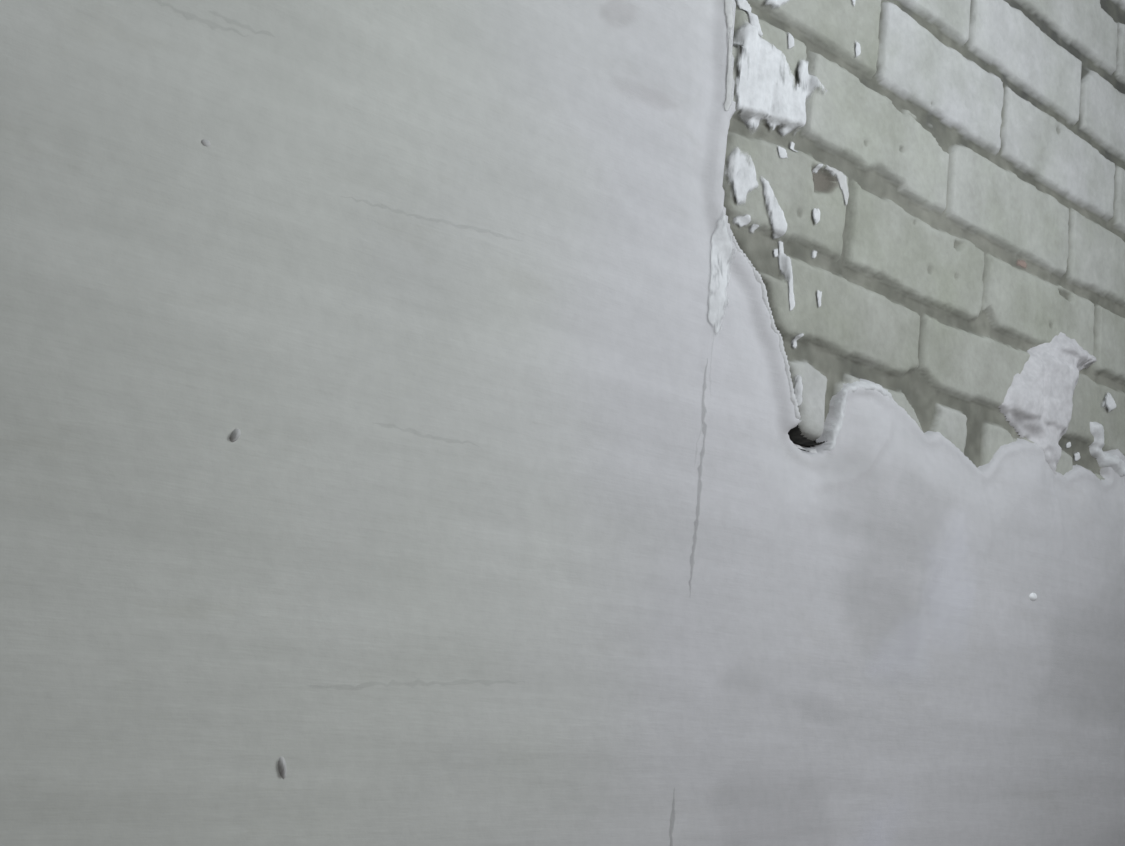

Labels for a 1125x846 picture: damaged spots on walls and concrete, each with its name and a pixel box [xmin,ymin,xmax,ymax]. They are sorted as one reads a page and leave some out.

spalling [722,0,1125,480]